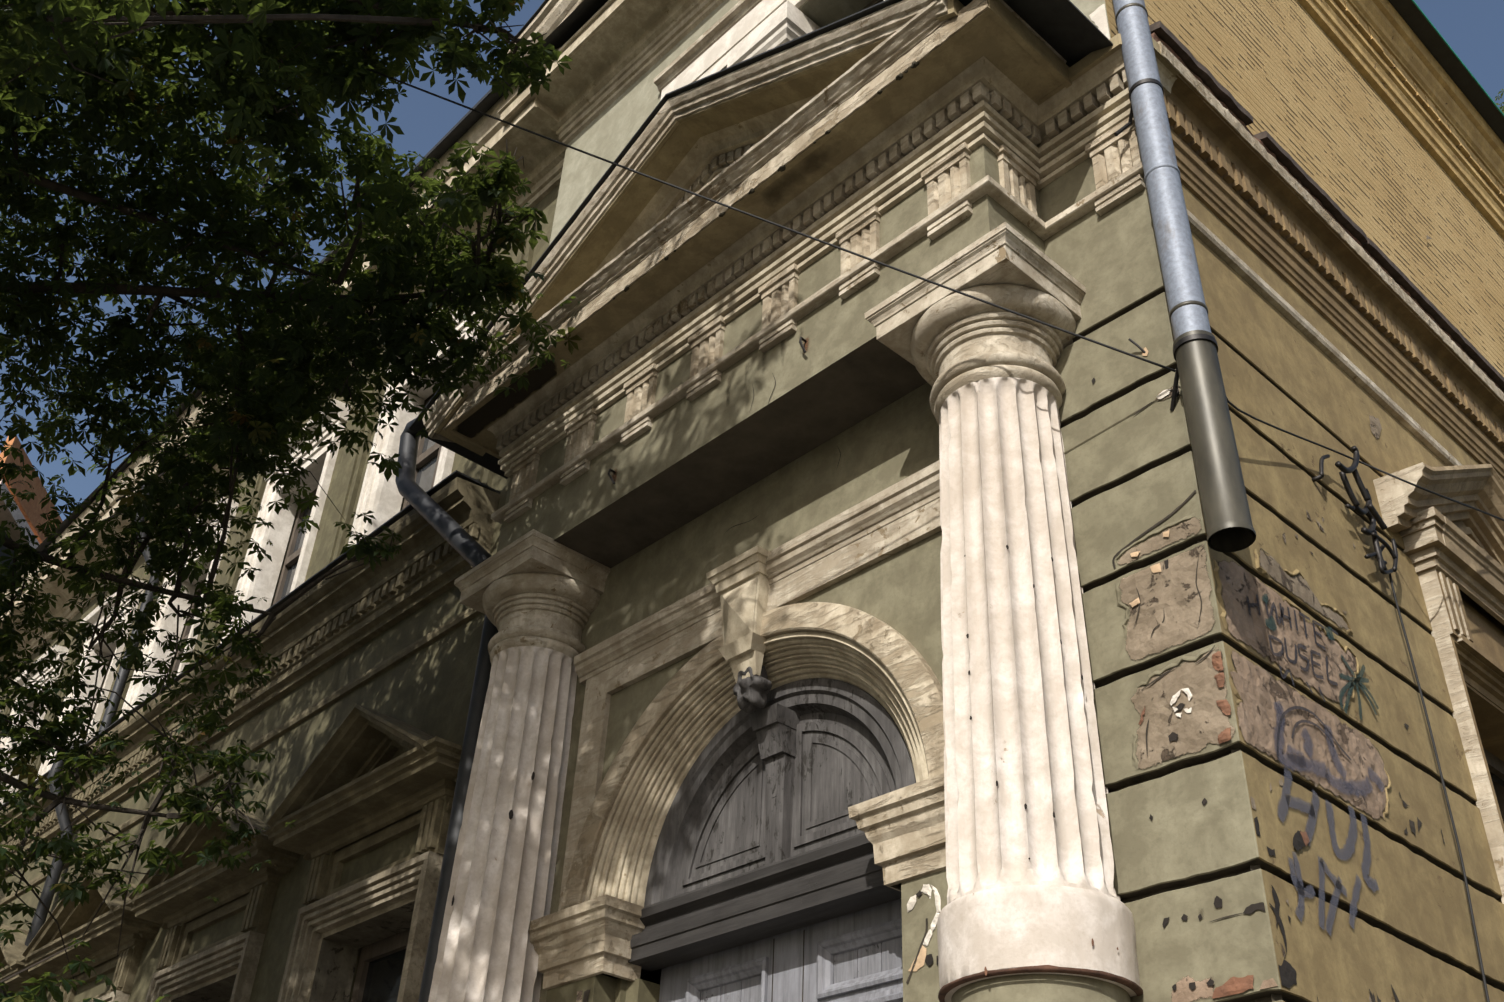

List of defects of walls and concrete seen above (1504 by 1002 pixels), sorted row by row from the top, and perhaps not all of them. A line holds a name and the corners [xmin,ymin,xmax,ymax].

spalling [1112,490,1422,836]
peeling [1250,796,1276,856]
peeling [1271,885,1301,927]
spalling [1171,975,1278,1002]